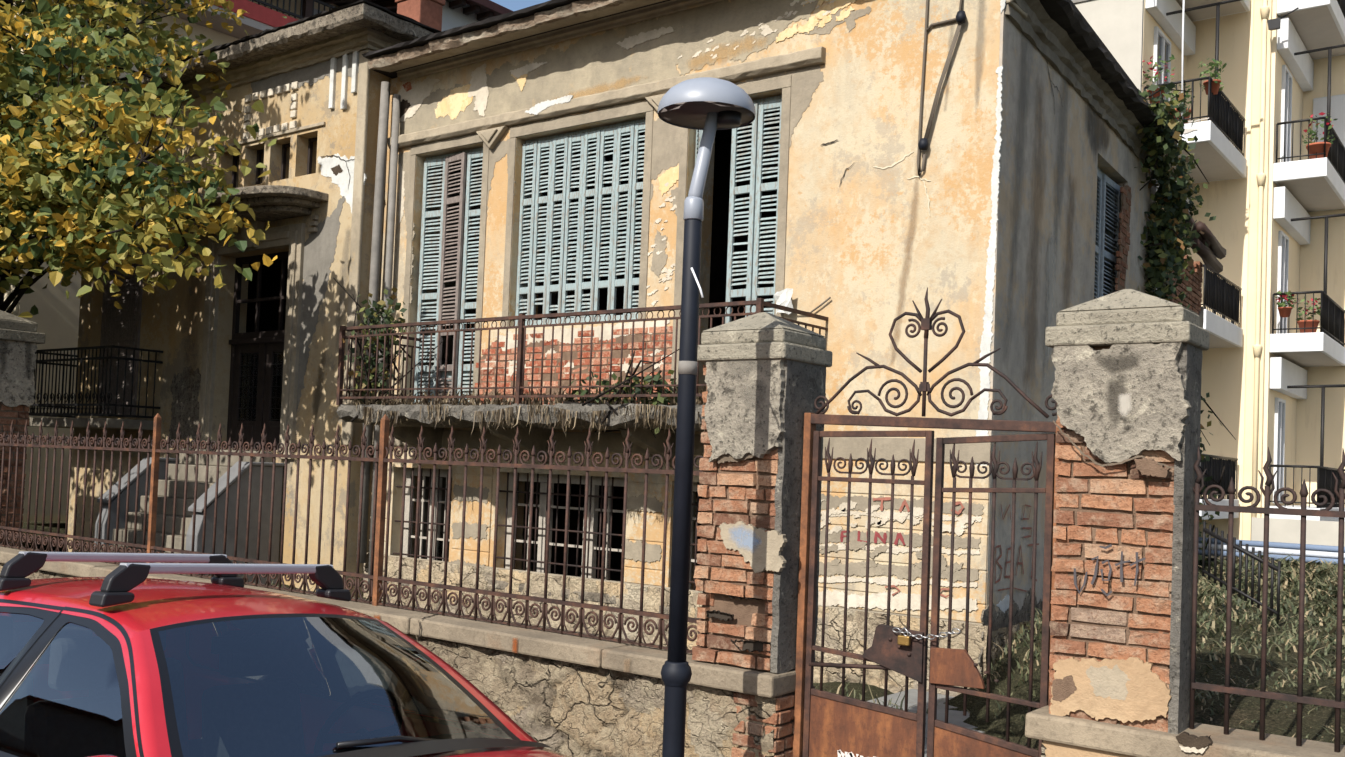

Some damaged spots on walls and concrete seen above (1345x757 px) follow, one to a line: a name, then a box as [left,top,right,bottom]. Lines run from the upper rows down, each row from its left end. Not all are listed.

peeling [391,0,872,224]
peeling [296,153,367,420]
peeling [398,150,415,313]
spalling [475,118,681,405]
spalling [976,65,1004,436]
damp [1106,357,1135,421]
spalling [711,436,782,464]
spalling [1053,420,1174,478]
spalling [719,521,787,573]
spalling [706,588,771,621]
spalling [731,639,771,652]
spalling [1050,656,1172,723]